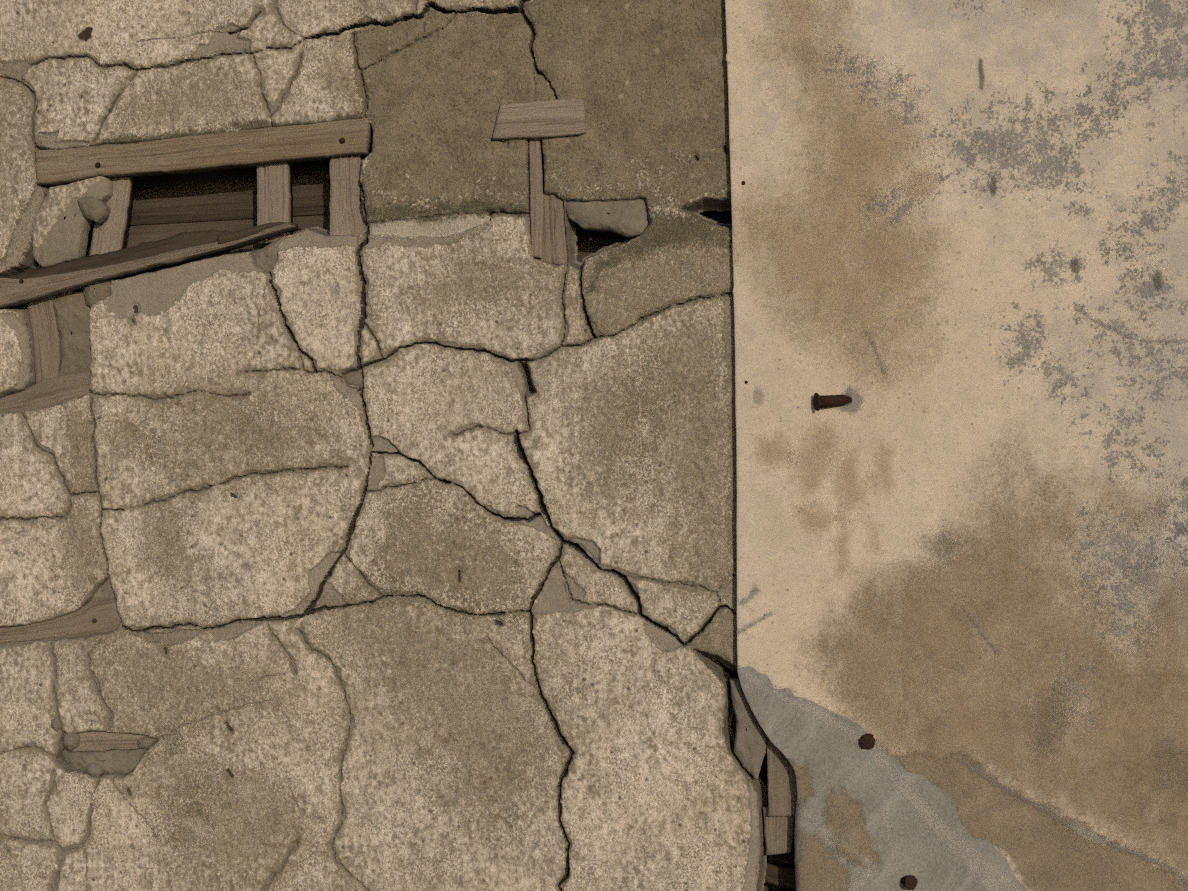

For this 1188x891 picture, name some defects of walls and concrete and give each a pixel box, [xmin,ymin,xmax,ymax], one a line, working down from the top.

crack [0,0,558,149]
leakage [745,0,934,373]
peeling [919,0,1188,220]
hole [55,730,135,777]
crack [0,187,737,891]
flaking render [280,0,1028,891]
leakage [819,491,1188,891]
peeling [989,151,1188,650]